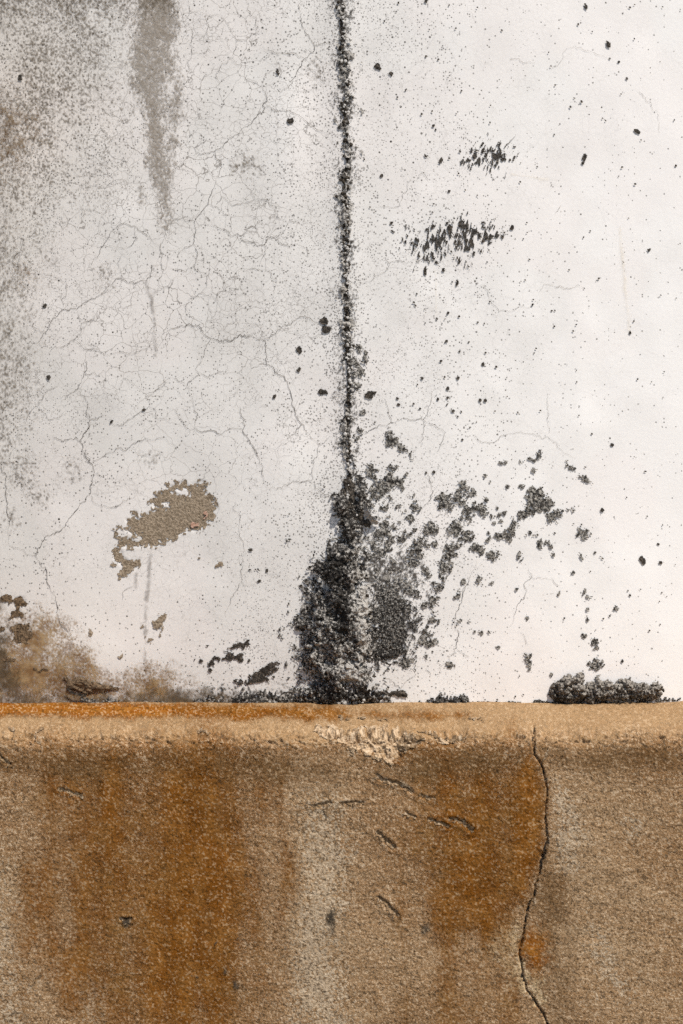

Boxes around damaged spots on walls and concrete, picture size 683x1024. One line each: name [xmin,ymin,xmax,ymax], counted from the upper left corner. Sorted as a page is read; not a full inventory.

damp [0,0,184,230]
crack [1,0,446,650]
peeling [110,479,219,580]
mould [355,431,575,669]
damp [0,616,310,703]
corrosion [0,702,388,721]
spalling [314,715,464,800]
mould [371,588,681,704]
corrosion [99,756,252,1024]
corrosion [430,758,513,941]
crack [519,727,549,1024]